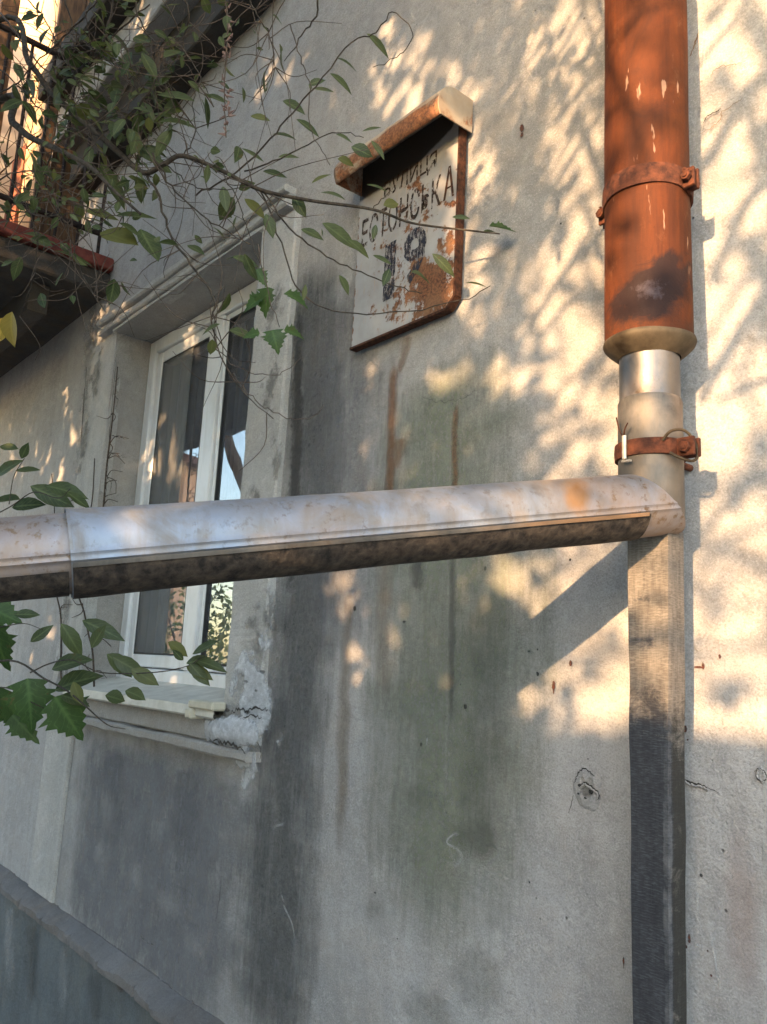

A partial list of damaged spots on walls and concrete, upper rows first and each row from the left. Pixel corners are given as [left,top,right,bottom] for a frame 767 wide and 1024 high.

peeling [263,370,277,407]
water stain [290,278,368,496]
corrosion [387,374,395,490]
water stain [400,375,499,489]
water stain [243,571,361,1024]
water stain [376,554,515,902]
crack [685,779,718,793]